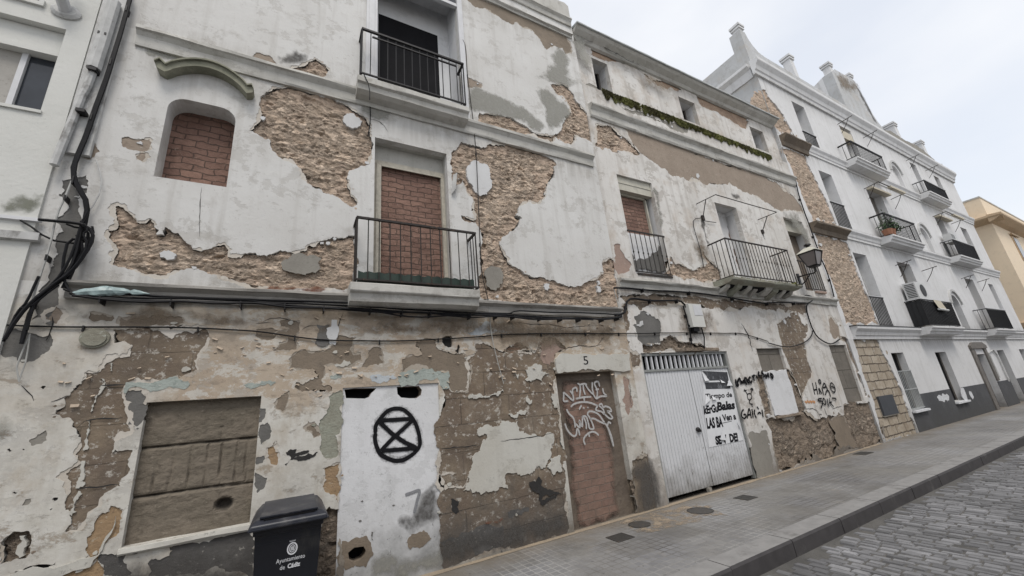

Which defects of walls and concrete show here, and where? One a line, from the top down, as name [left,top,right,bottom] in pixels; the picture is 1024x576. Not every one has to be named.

peeling [467,78,483,88]
peeling [121,137,153,162]
spalling [249,86,372,209]
spalling [104,202,359,291]
spalling [450,141,916,472]
spalling [50,311,223,576]
spalling [241,318,569,576]